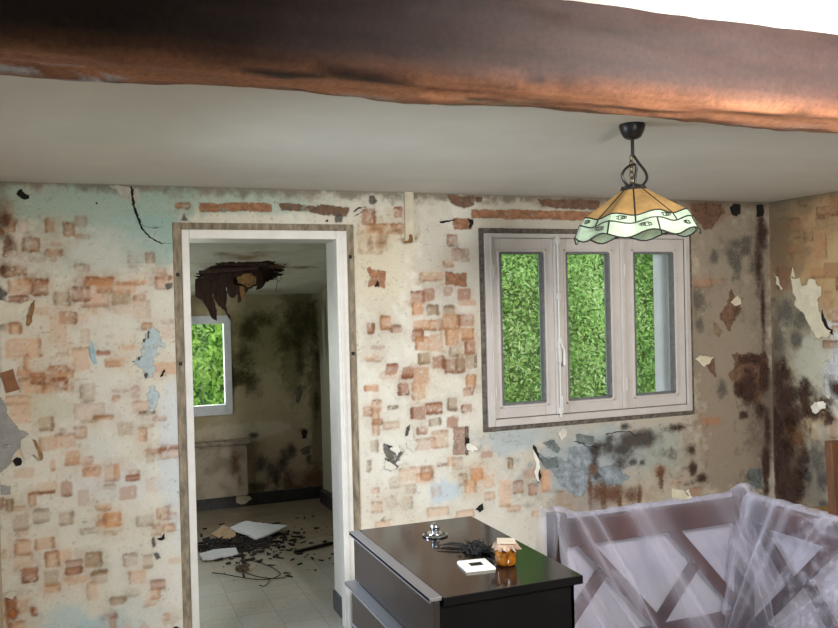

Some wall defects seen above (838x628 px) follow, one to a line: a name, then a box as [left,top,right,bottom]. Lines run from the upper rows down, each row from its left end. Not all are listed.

crack [110,185,171,244]
spalling [195,260,286,321]
water stain [232,314,273,390]
water stain [710,217,768,333]
water stain [775,302,806,347]
flaking render [774,267,833,339]
flaking render [811,348,838,414]
spalling [0,369,43,472]
water stain [249,445,321,492]
flaking render [383,425,418,471]
peeling [533,428,630,497]
water stain [718,355,838,504]